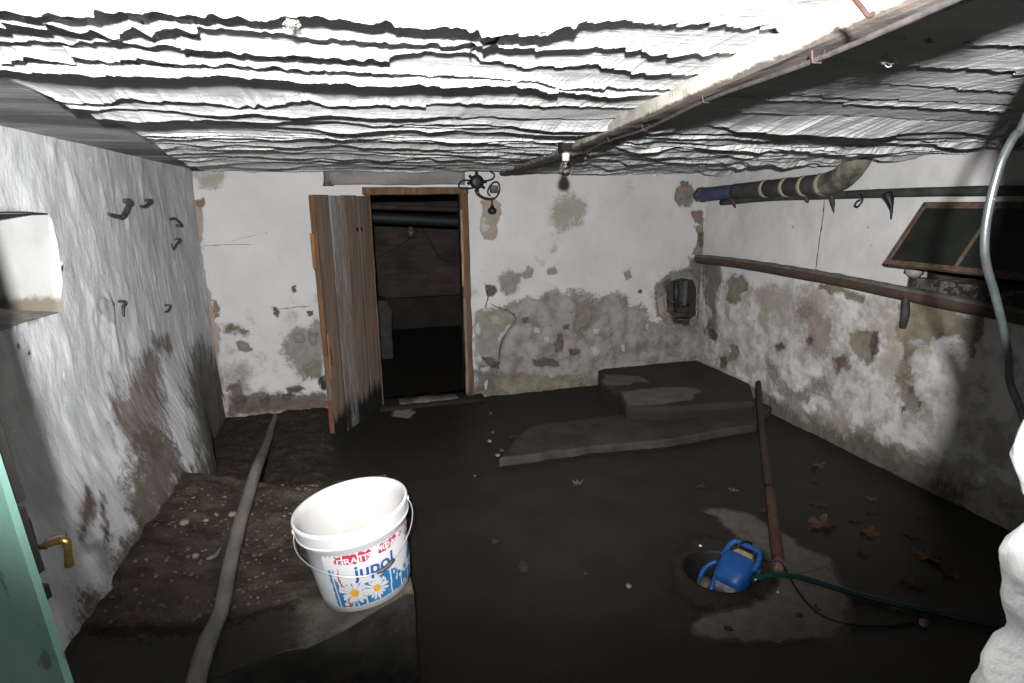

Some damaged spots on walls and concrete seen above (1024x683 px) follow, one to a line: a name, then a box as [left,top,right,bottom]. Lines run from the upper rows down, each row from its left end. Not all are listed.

peeling [194,198,206,273]
peeling [480,199,501,240]
damp [552,195,586,230]
flaking render [674,181,704,255]
flaking render [655,267,718,342]
flaking render [726,273,748,303]
flaking render [207,288,327,417]
damp [280,322,325,380]
flaking render [720,344,739,369]
flaking render [835,330,879,373]
damp [756,343,963,507]
damp [73,330,226,630]